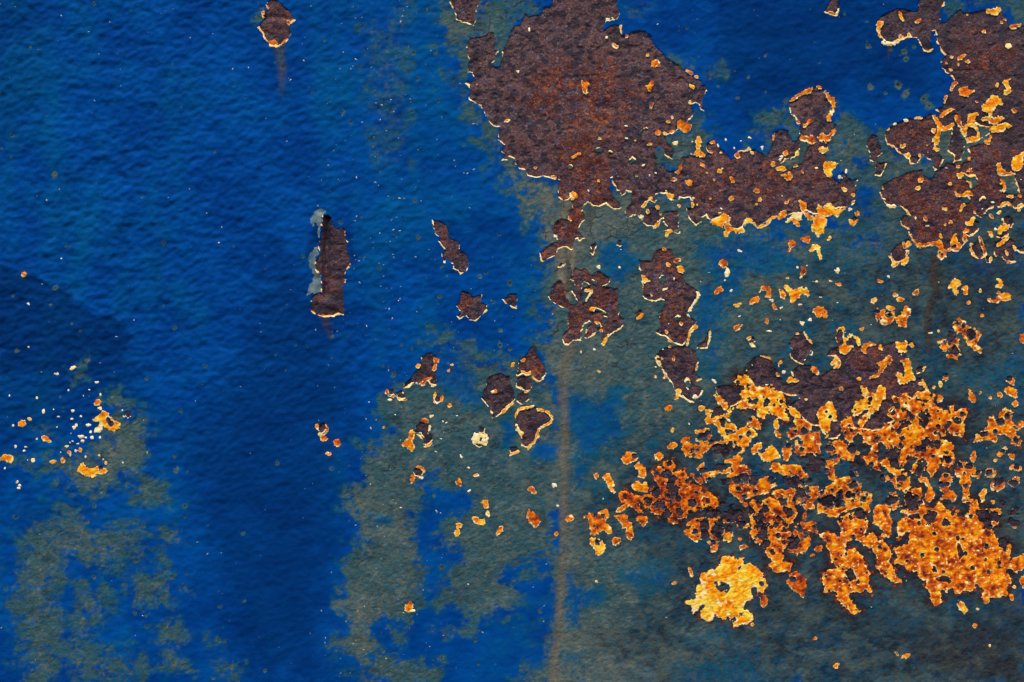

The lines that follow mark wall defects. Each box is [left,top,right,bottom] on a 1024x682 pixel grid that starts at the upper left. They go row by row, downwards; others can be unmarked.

corrosion [257,0,295,63]
peeling [307,208,326,295]
corrosion [310,215,350,317]
corrosion [432,220,469,275]
corrosion [450,0,1024,630]
corrosion [385,353,454,408]
corrosion [93,399,131,432]
corrosion [49,447,107,478]